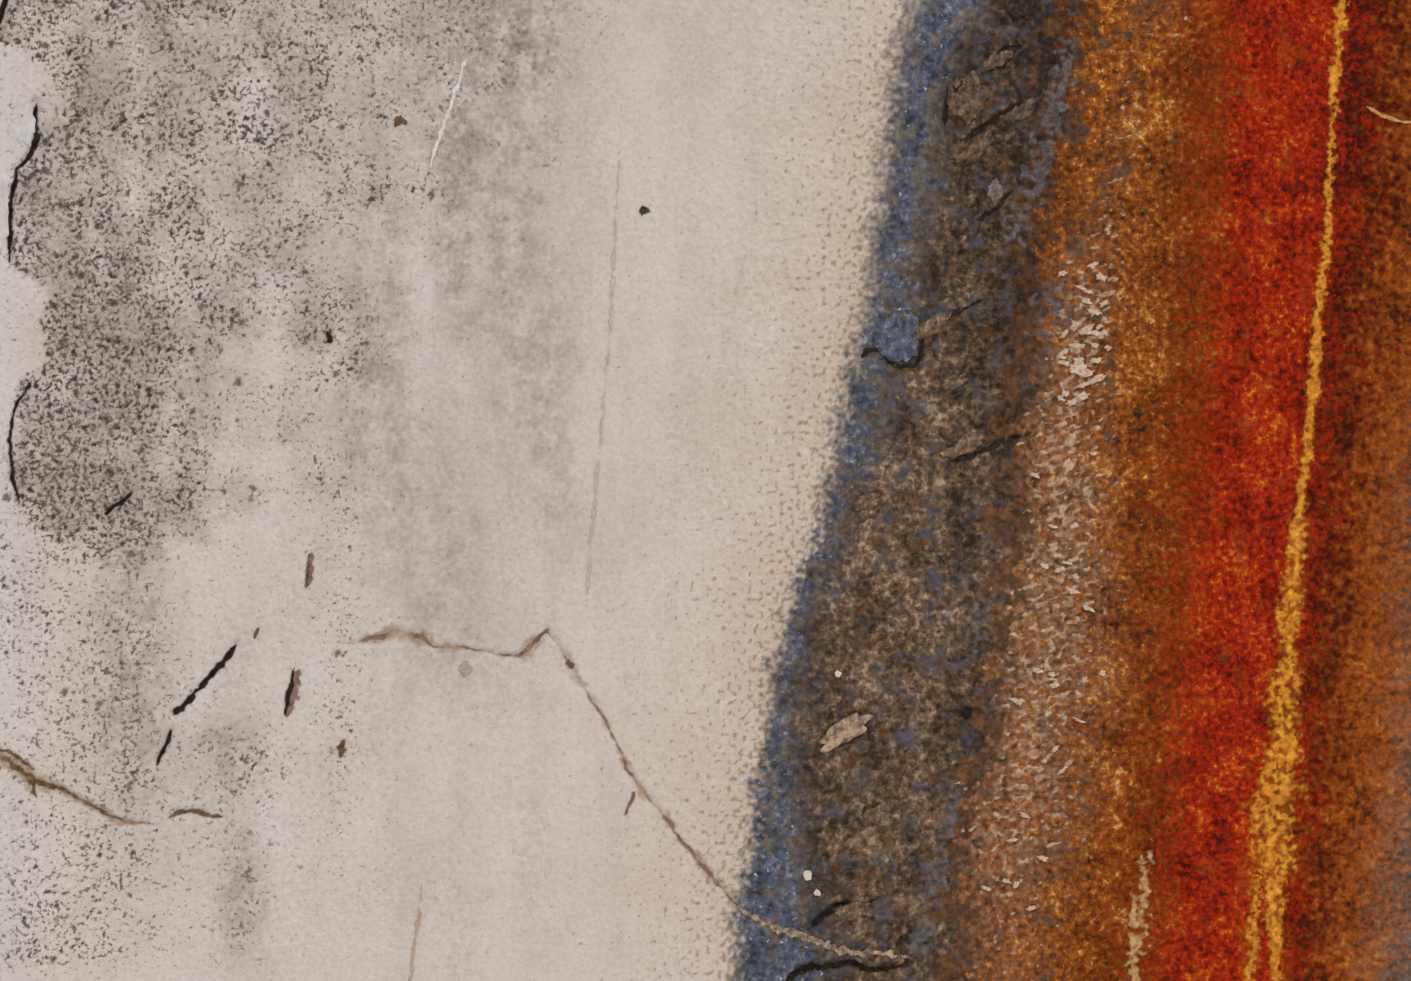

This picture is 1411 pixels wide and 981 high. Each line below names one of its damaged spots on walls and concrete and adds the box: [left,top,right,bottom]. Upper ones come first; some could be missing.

peeling [16,104,36,148]
peeling [0,171,9,252]
peeling [784,0,1089,981]
corrosion [938,0,1411,981]
crack [362,628,569,661]
crack [156,627,260,765]
crack [0,749,222,825]
crack [587,693,912,981]
crack [409,911,421,981]